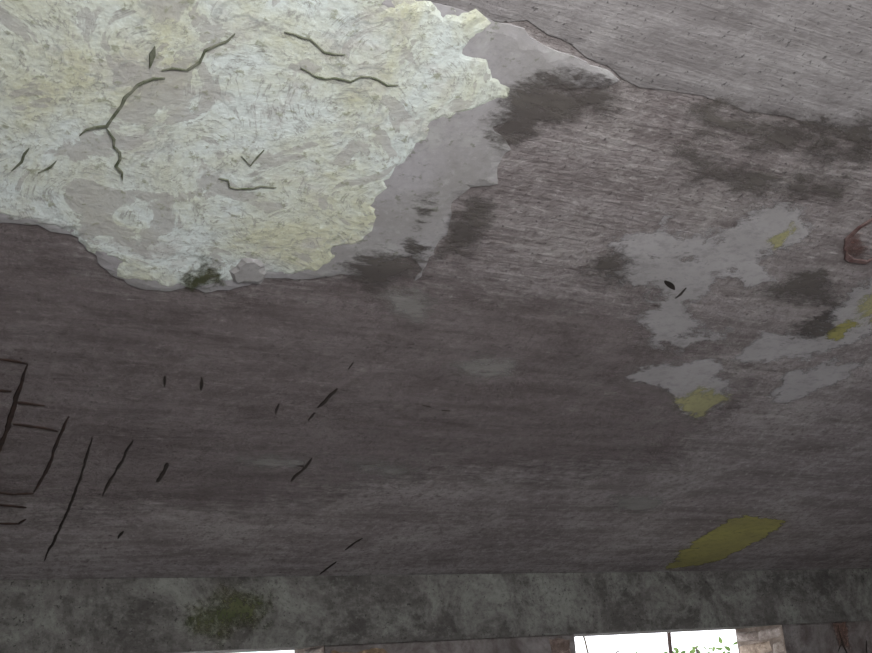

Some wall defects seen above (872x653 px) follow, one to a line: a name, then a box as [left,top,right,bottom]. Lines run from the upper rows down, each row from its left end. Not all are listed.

crack [284,31,345,55]
crack [301,68,398,86]
crack [11,148,57,173]
crack [79,33,235,181]
peeling [0,0,619,293]
water stain [674,146,849,200]
water stain [682,98,872,169]
water stain [760,269,844,338]
peeling [825,295,872,341]
peeling [675,387,731,418]
crack [0,358,70,525]
peeling [665,515,786,569]